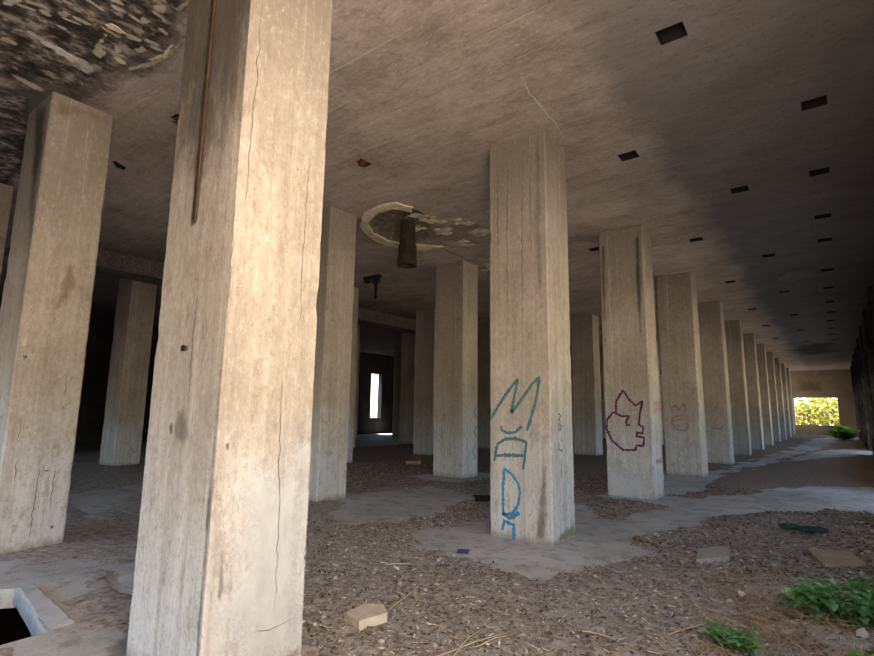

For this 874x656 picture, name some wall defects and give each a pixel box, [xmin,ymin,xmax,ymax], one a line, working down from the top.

peeling [3,0,189,74]
peeling [12,75,45,92]
rust [191,0,217,225]
spalling [359,202,491,251]
crack [29,459,55,537]